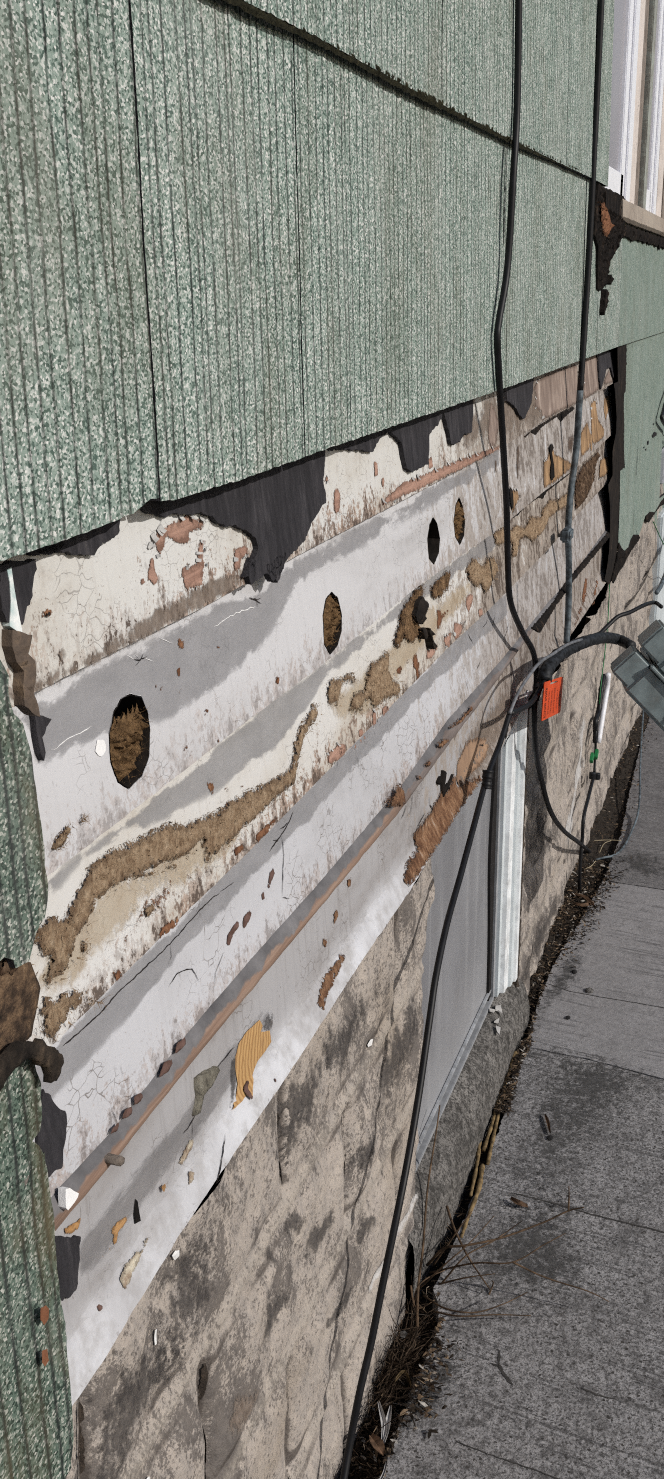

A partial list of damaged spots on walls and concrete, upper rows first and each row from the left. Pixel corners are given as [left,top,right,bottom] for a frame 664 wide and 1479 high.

peeling [533,354,617,479]
peeling [2,567,22,632]
peeling [141,514,208,590]
spalling [531,531,610,633]
leakage [459,689,523,785]
leakage [40,837,235,983]
peeling [227,869,275,945]
peeling [233,1020,271,1109]
leakage [277,983,390,1174]
leakage [80,1048,238,1269]
leakage [285,1209,335,1260]
leakage [92,1212,226,1479]